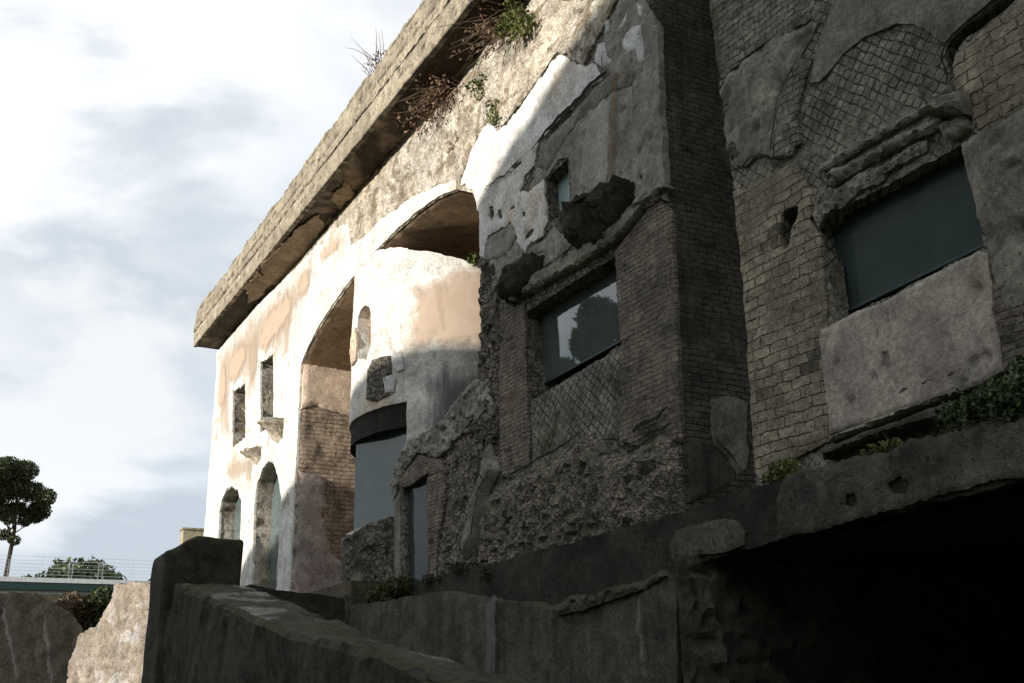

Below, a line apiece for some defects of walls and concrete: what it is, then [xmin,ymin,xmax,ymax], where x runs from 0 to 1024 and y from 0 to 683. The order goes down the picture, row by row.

flaking render [536,3,645,190]
water stain [220,283,299,431]